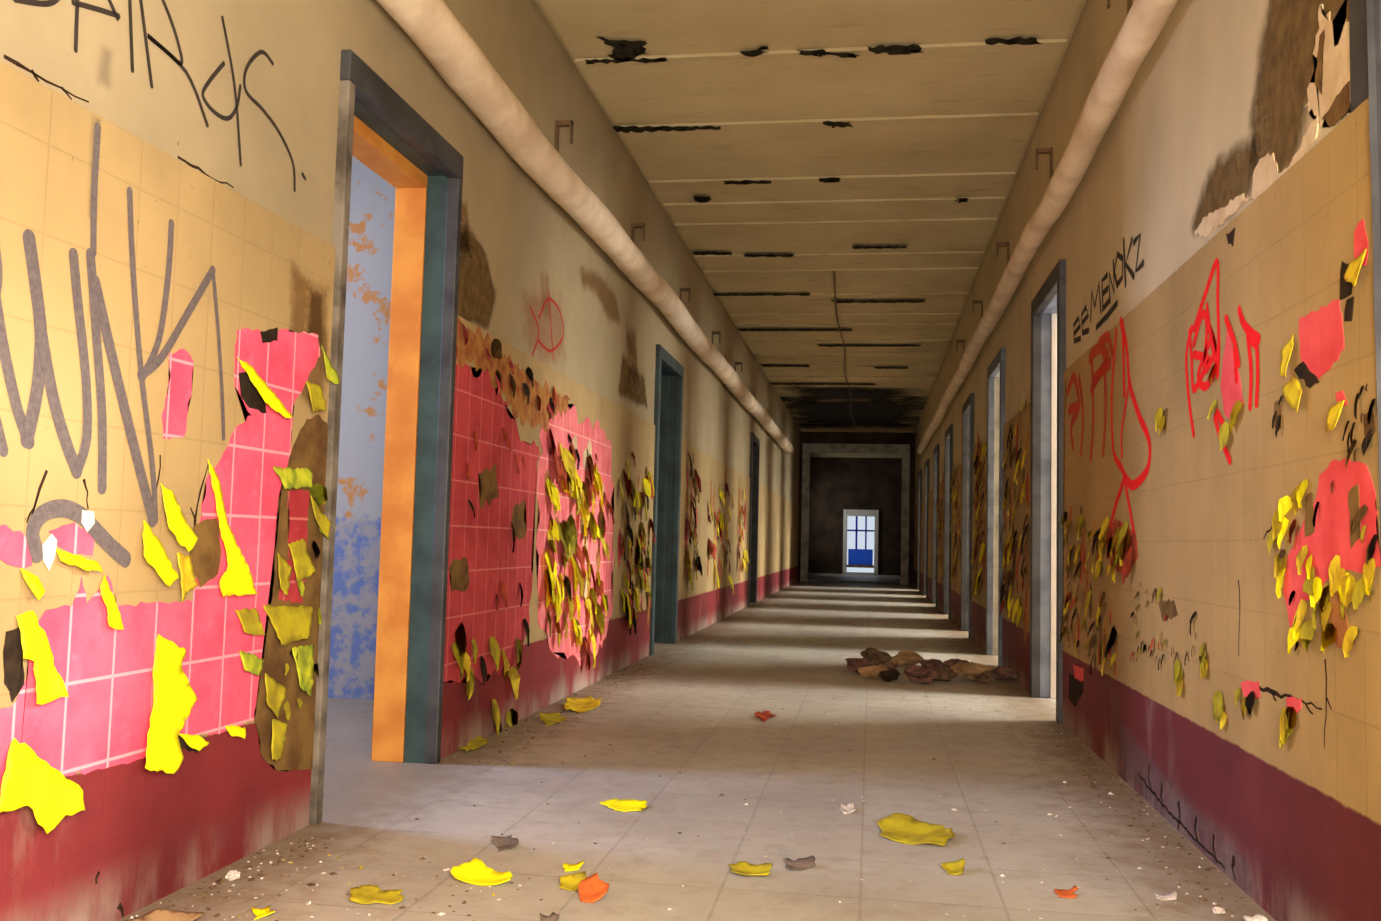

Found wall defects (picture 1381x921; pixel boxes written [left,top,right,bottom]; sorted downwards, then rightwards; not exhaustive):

peeling [585,37,668,64]
peeling [798,44,922,58]
peeling [985,36,1044,45]
spalling [1194,0,1351,246]
peeling [1272,219,1368,438]
peeling [0,327,339,834]
peeling [443,317,655,735]
peeling [685,452,749,606]
peeling [1060,505,1208,706]
peeling [1212,681,1261,731]
peeling [1279,697,1302,749]
peeling [1267,384,1381,658]